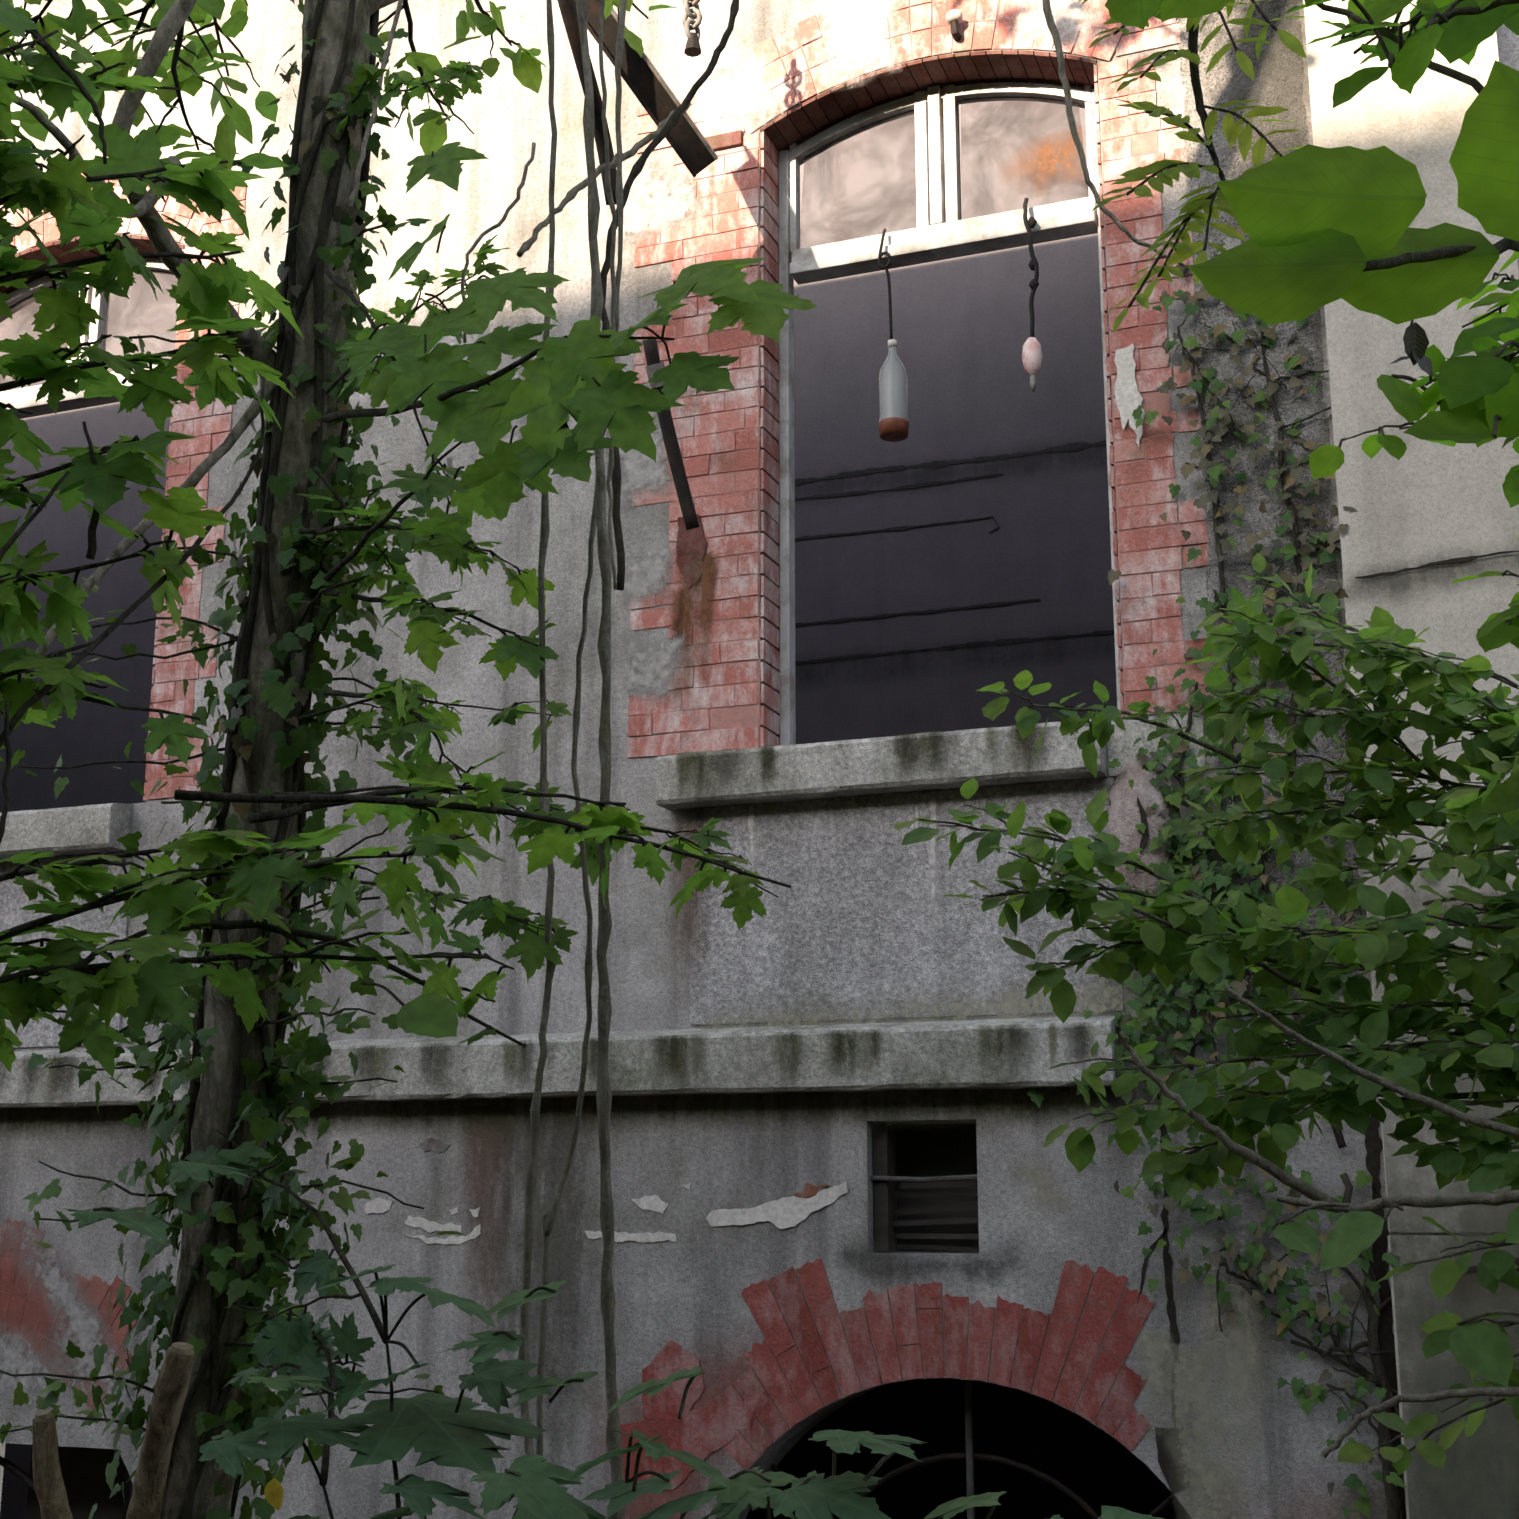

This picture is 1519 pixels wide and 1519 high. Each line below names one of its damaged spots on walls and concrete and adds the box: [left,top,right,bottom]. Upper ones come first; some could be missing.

peeling [1114,343,1146,448]
rust [671,514,716,676]
damp [677,749,737,784]
damp [895,731,946,767]
damp [0,1055,105,1130]
damp [503,1041,548,1079]
damp [655,1011,880,1077]
damp [901,985,1123,1061]
peeling [585,1195,677,1243]
peeling [706,1181,848,1229]
flaking render [0,1226,127,1405]